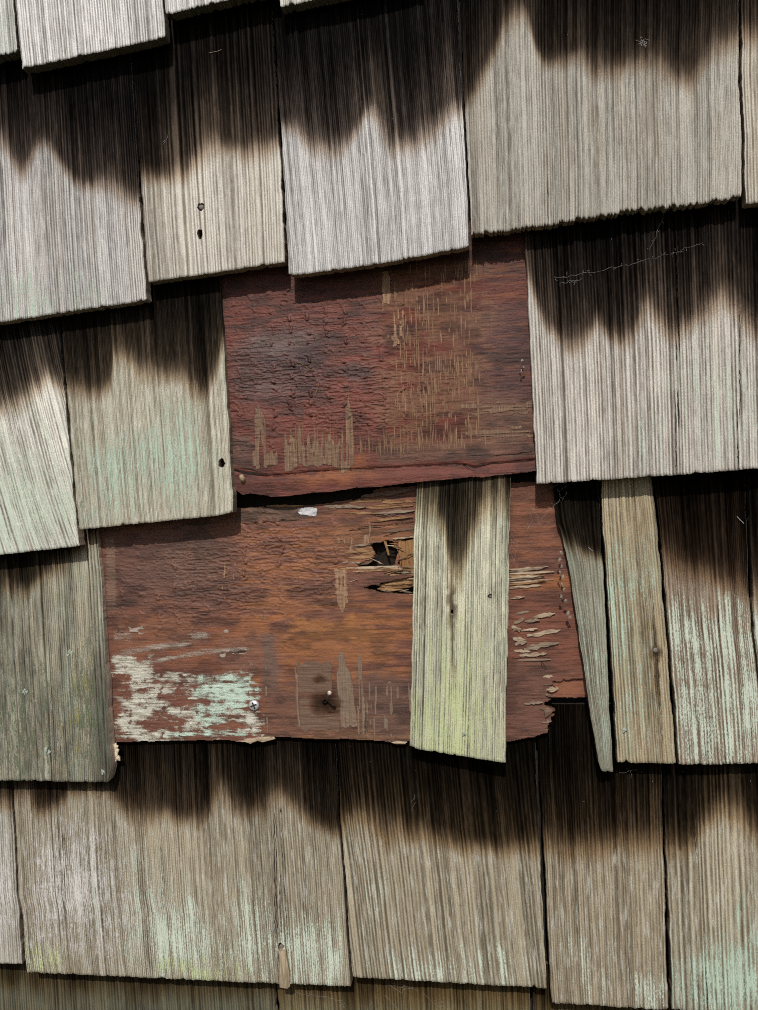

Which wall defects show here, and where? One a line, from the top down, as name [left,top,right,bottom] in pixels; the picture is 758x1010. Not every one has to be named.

peeling [111,626,268,741]